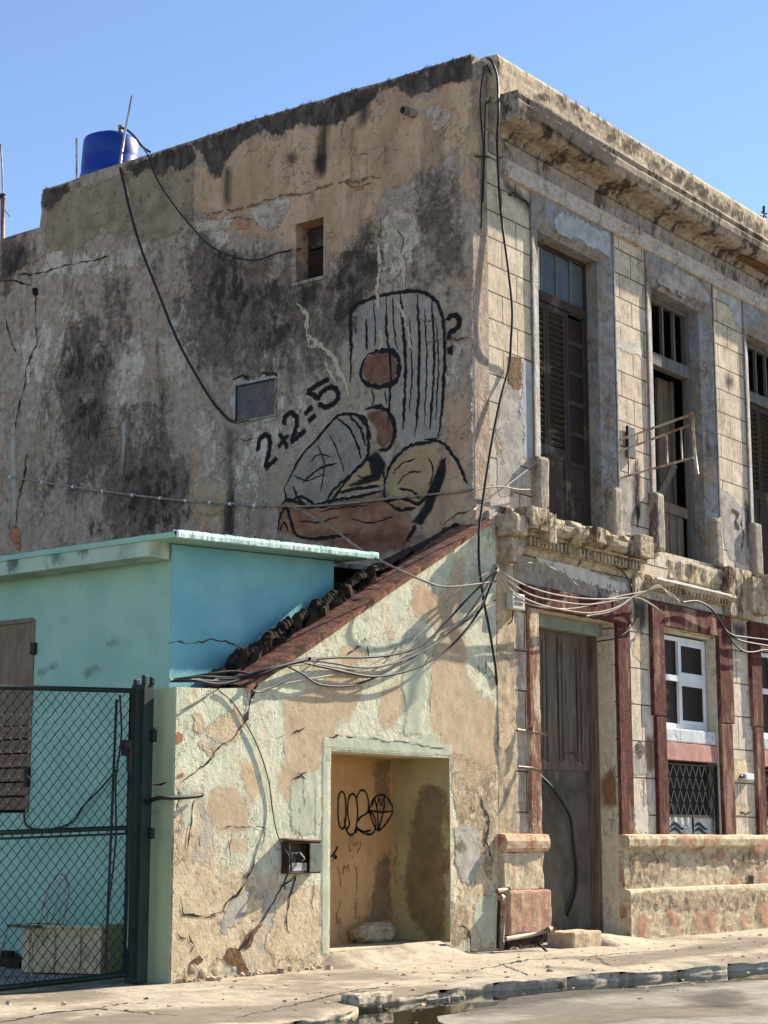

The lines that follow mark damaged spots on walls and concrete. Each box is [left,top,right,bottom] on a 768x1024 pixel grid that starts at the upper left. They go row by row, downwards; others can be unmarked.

leakage [41,182,70,209]
peeling [27,162,291,263]
leakage [126,55,475,202]
leakage [530,93,768,238]
crack [0,255,108,431]
crack [297,303,350,398]
peeling [536,478,654,598]
crack [170,638,240,648]
peeling [380,558,497,879]
peeling [171,763,322,983]
crack [239,876,314,950]
leakage [405,785,466,940]